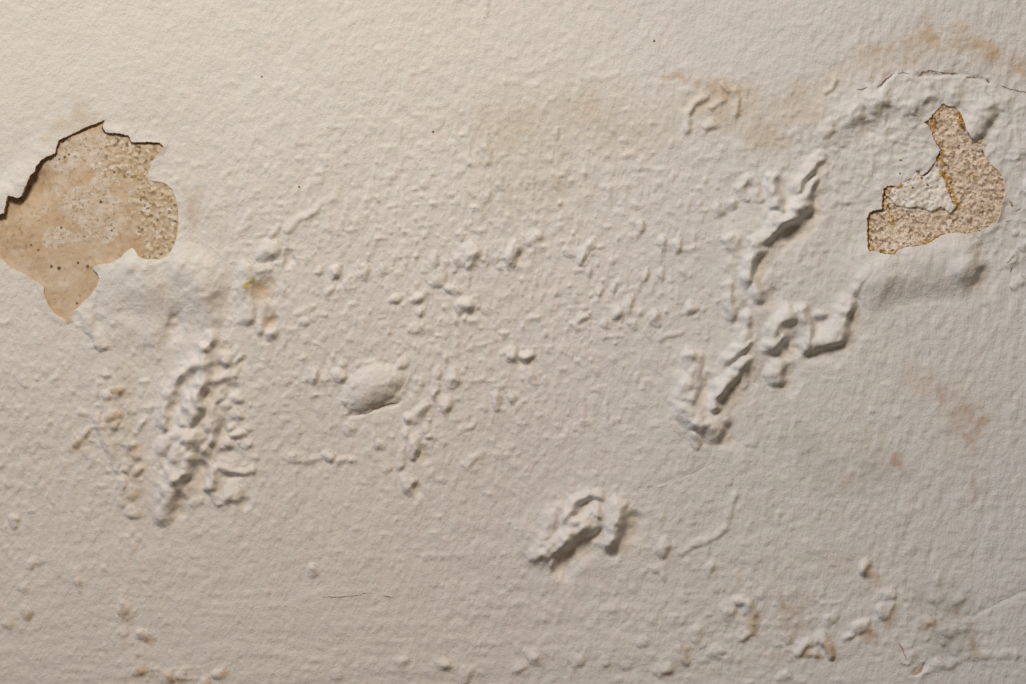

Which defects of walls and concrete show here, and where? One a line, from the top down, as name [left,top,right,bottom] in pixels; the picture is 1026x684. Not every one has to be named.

peeling [0,121,179,322]
peeling [867,103,1006,255]